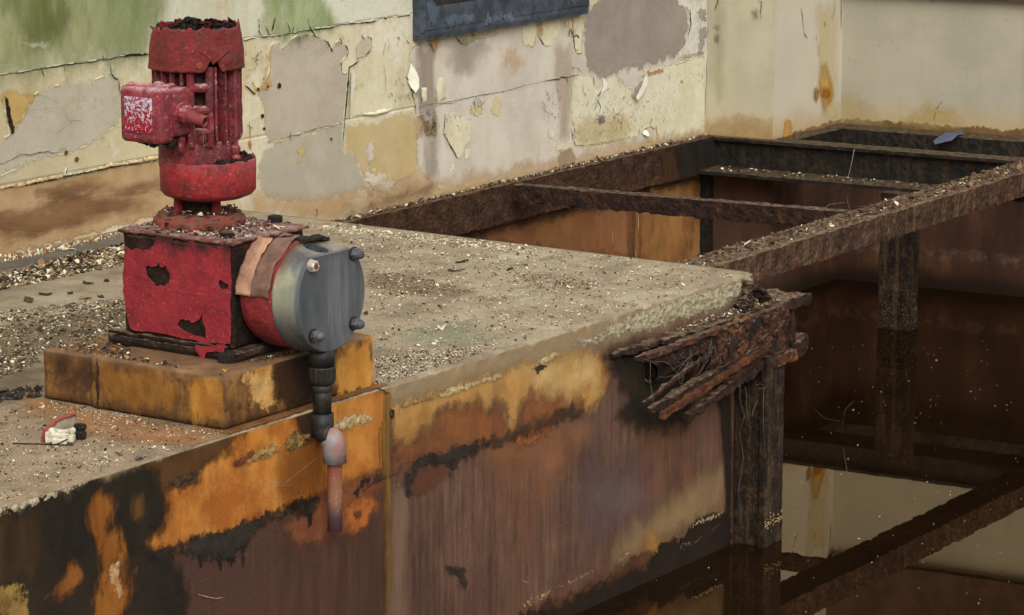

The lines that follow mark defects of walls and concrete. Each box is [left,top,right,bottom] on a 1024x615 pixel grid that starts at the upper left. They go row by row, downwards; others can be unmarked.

peeling [0,73,121,179]
peeling [256,32,398,204]
crack [243,12,707,158]
peeling [407,0,707,190]
rust [814,10,834,114]
damp [0,161,174,270]
rust [487,208,700,263]
spalling [573,277,753,347]
rust [24,364,328,552]
rust [331,335,610,535]
rust [46,564,83,599]
rust [88,490,129,615]